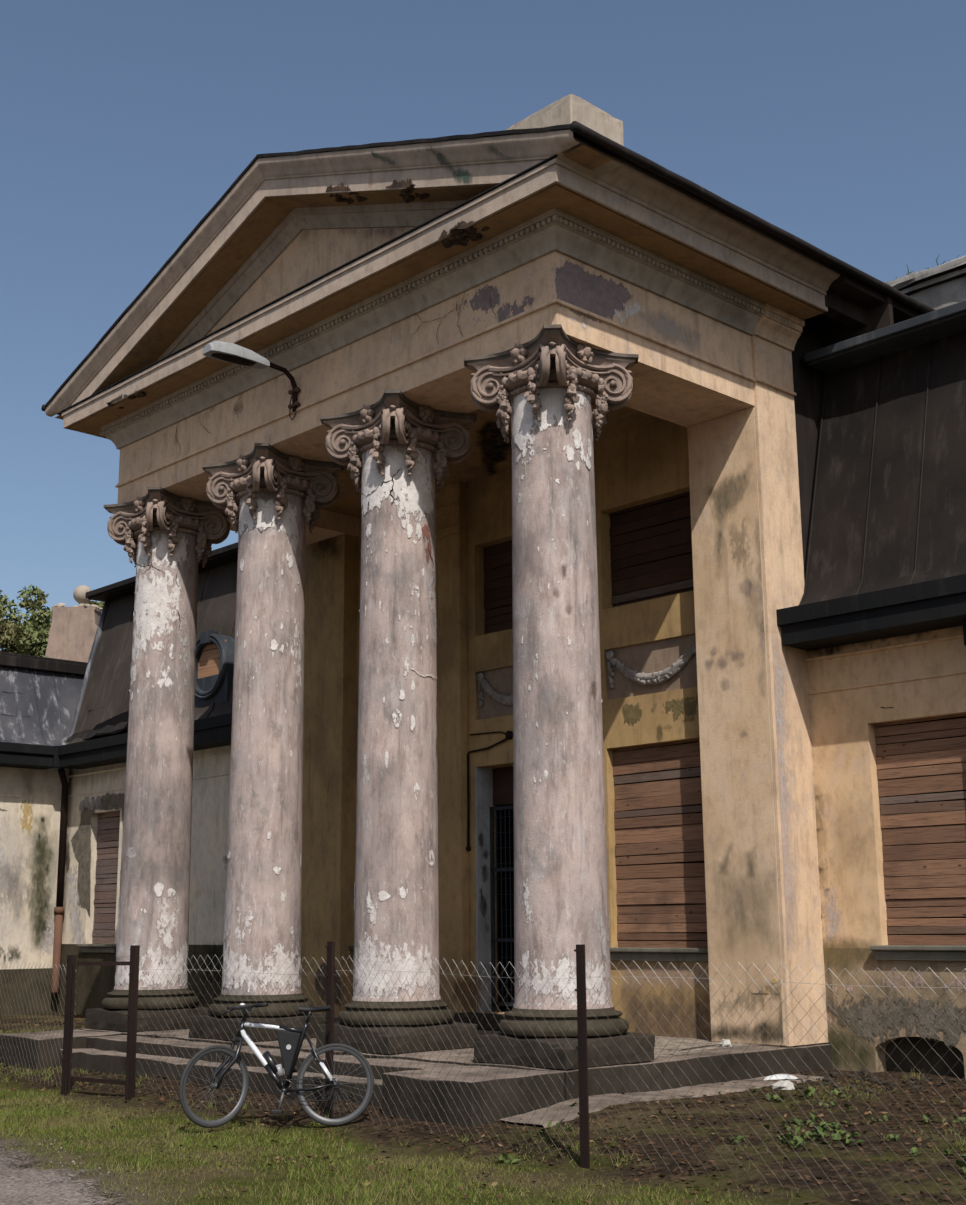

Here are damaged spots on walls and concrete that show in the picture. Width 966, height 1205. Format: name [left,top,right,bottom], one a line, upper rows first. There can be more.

damp [431,148,470,183]
peeling [555,261,645,330]
peeling [129,533,191,701]
peeling [233,610,302,690]
peeling [238,498,299,575]
crack [362,468,424,510]
peeling [361,445,437,731]
peeling [478,388,593,503]
damp [713,474,745,545]
spalling [66,793,125,945]
peeling [115,882,189,987]
peeling [222,883,438,1005]